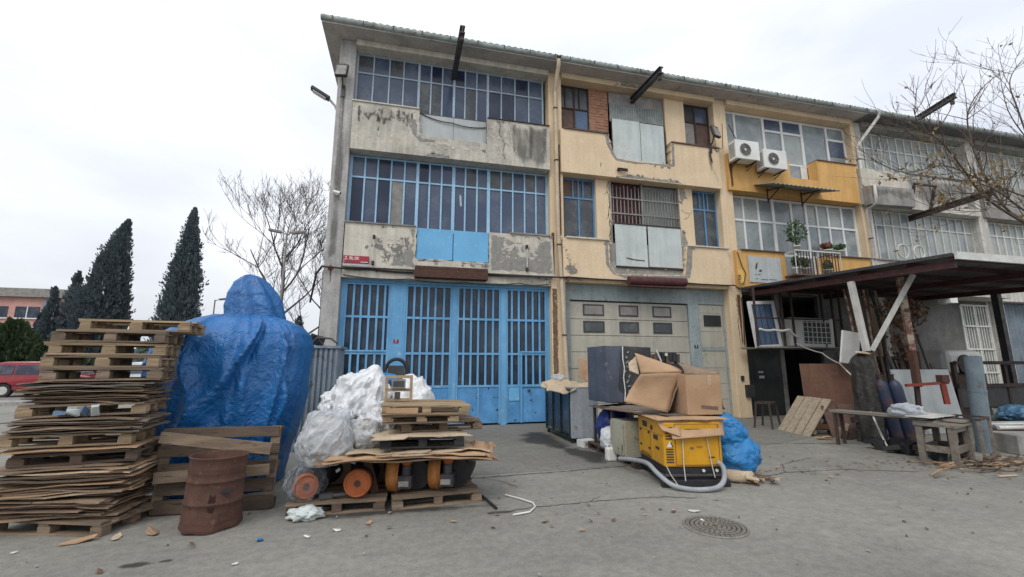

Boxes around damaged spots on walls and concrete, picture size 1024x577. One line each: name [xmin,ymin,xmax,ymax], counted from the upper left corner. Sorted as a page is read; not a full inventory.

peeling [365,229,438,267]
peeling [461,234,559,380]
damp [514,126,546,162]
spalling [604,134,695,279]